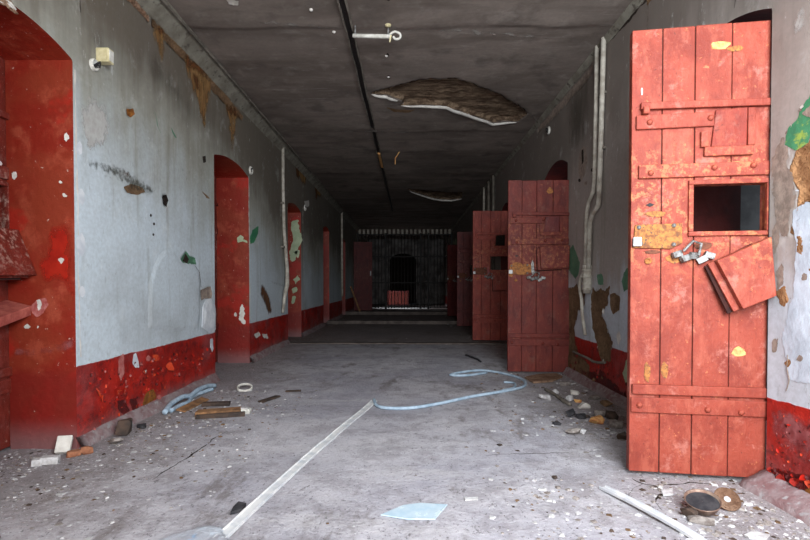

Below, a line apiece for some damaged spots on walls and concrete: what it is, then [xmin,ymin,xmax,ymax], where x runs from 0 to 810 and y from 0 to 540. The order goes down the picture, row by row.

spalling [372,78,527,126]
peeling [289,220,304,268]
spalling [568,245,628,398]
crack [152,435,219,480]
peeling [766,414,810,494]